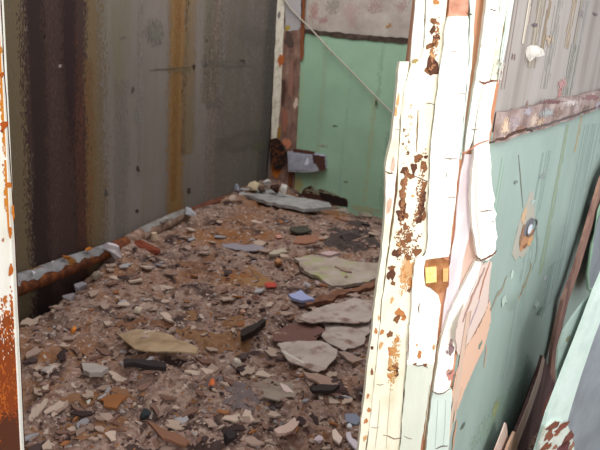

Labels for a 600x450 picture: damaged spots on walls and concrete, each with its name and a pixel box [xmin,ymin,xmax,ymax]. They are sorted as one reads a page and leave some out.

rust [0,43,15,242]
rust [164,0,189,216]
rust [386,104,428,324]
rust [424,17,440,76]
peeling [501,102,545,137]
peeling [512,191,536,261]
rust [0,286,20,450]
peeling [446,228,492,450]
rust [540,421,574,450]